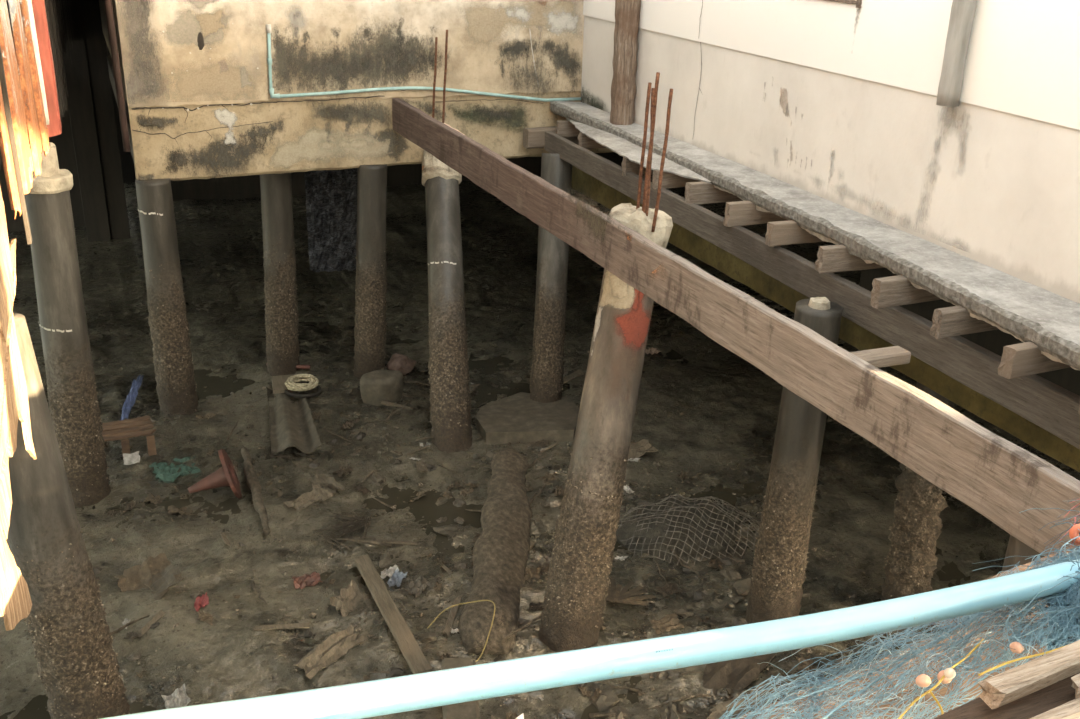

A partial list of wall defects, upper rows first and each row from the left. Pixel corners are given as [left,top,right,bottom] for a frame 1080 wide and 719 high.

damp [268,13,449,93]
mould [496,39,603,110]
crack [693,0,703,135]
damp [166,109,284,179]
crack [131,95,385,142]
damp [313,101,389,141]
mould [411,101,526,131]